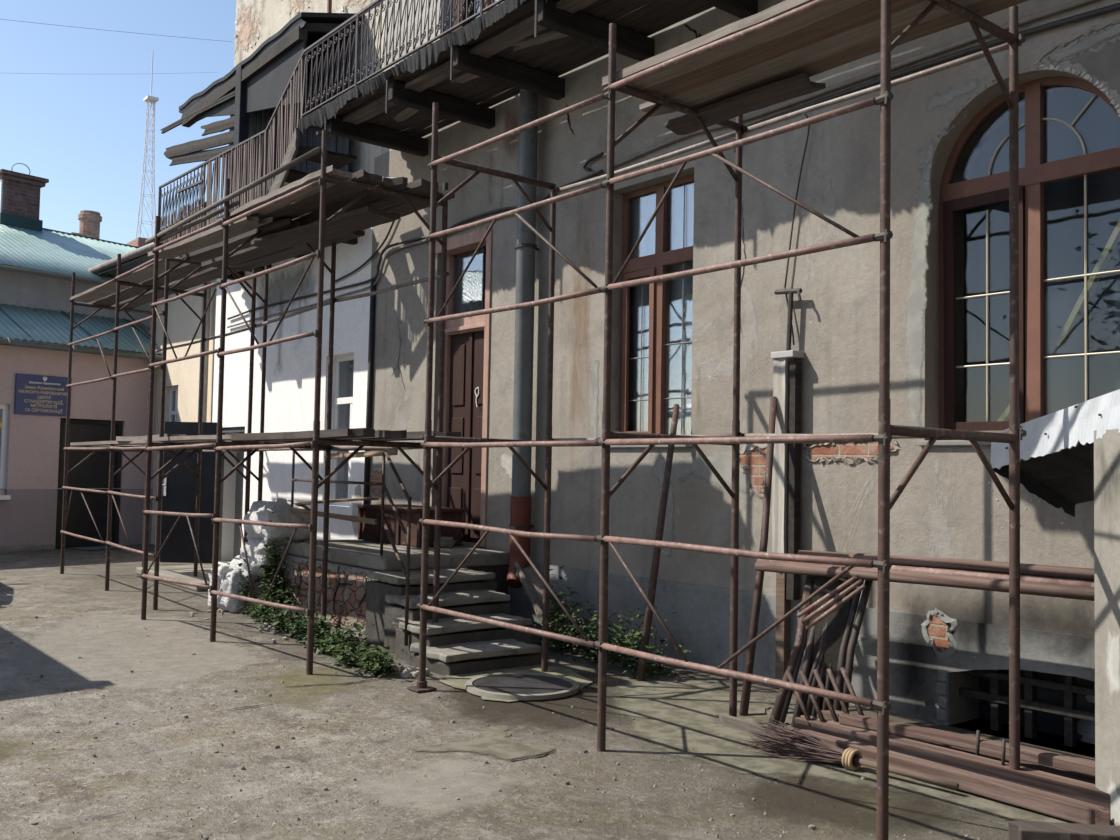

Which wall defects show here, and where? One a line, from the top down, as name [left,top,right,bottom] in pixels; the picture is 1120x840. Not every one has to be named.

flaking render [234,1,262,53]
crack [684,24,702,38]
flaking render [740,444,767,500]
flaking render [800,439,901,467]
flaking render [921,606,958,661]